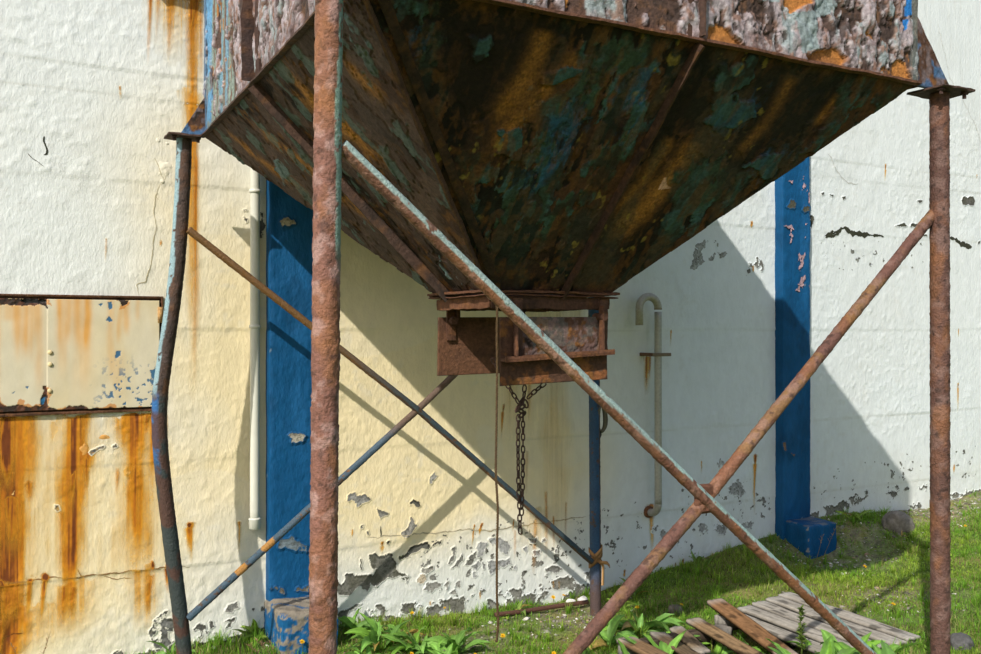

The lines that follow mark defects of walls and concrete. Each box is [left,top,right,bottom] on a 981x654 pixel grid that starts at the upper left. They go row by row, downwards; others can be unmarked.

rust [149,0,201,124]
rust [188,142,198,291]
spalling [785,180,846,238]
peeling [796,253,810,292]
rust [0,413,95,654]
rust [115,413,168,614]
peeling [346,491,390,520]
peeling [337,498,590,621]
peeling [810,476,870,518]
peeling [865,454,928,510]
peeling [90,608,176,654]
peeling [191,600,265,648]